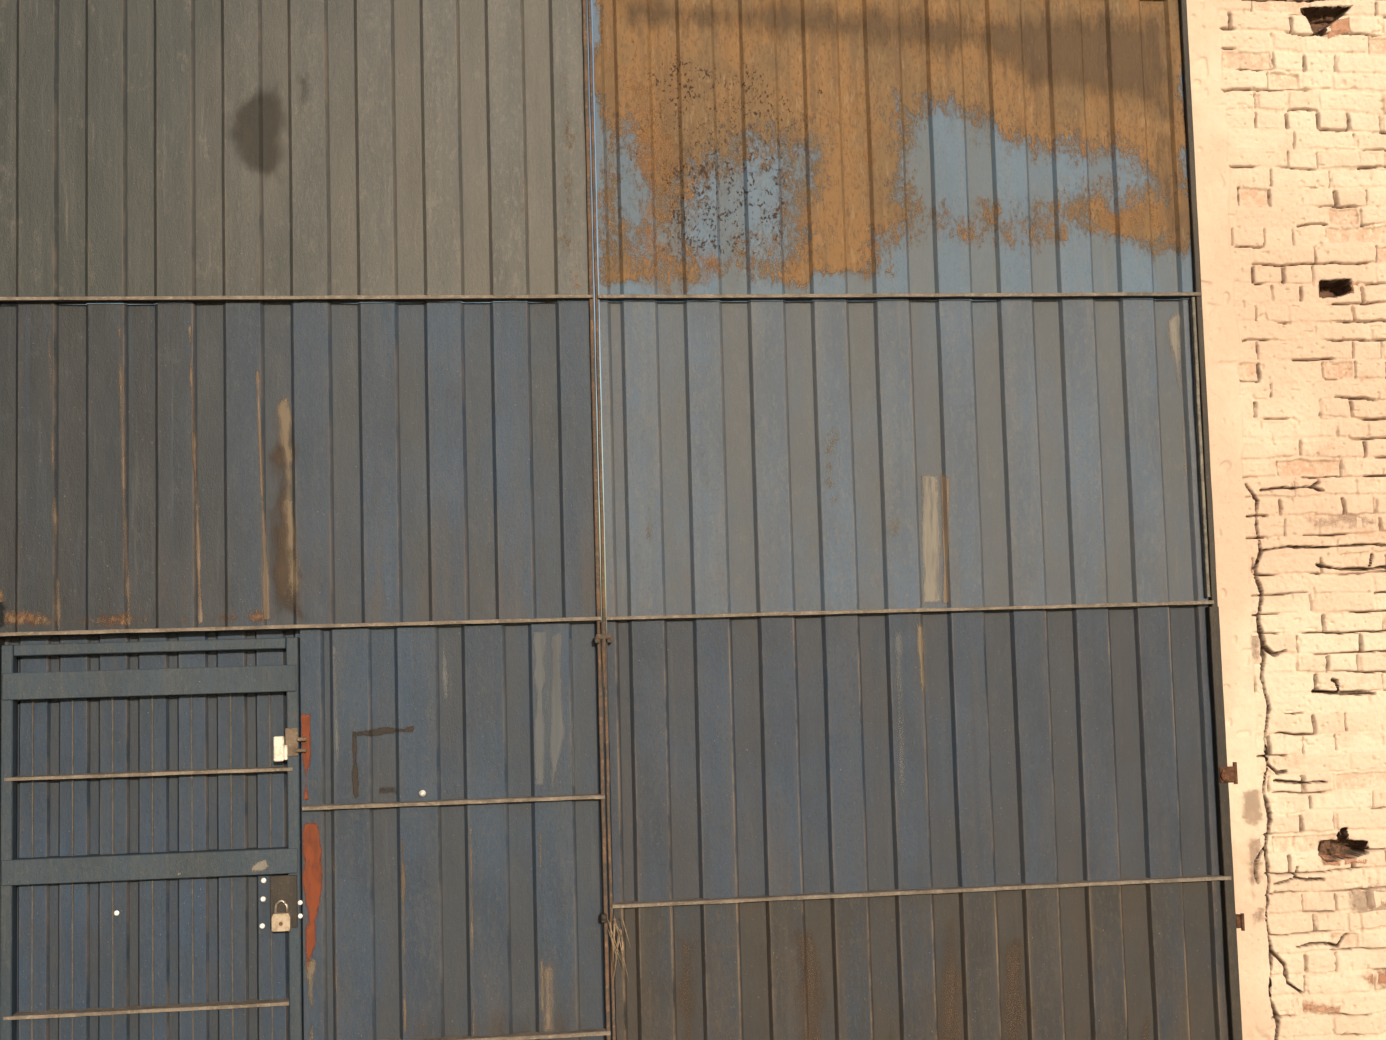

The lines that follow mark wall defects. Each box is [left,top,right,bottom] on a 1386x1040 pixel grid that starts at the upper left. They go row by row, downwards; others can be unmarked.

hole [1300,5,1353,38]
hole [1319,278,1357,298]
crack [1248,489,1386,570]
corrosion [0,590,51,624]
crack [1311,684,1369,695]
corrosion [301,714,311,800]
crack [1262,742,1310,783]
hole [1318,828,1369,865]
corrosion [302,823,322,1003]
crack [1265,912,1302,1017]
peeling [1367,971,1386,984]
peeling [1303,1002,1340,1013]